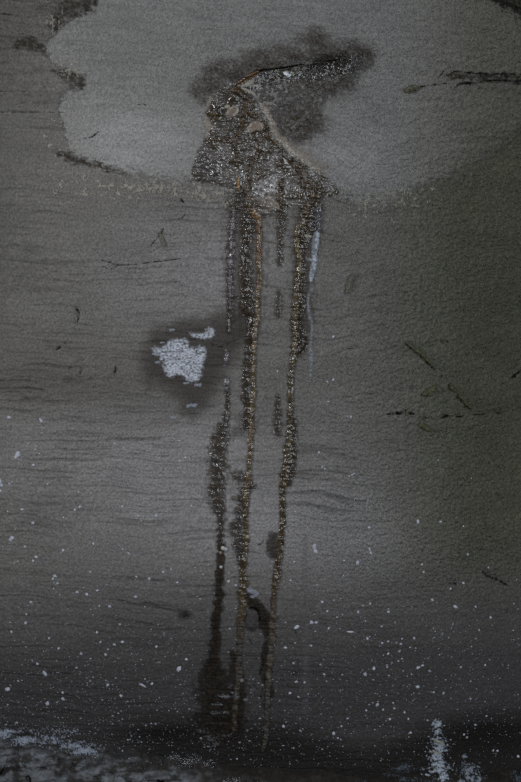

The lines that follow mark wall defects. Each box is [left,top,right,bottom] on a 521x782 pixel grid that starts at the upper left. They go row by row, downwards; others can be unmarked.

peeling [14,0,521,228]
crack [250,64,304,74]
efflorescence [152,327,214,387]
corrosion [194,190,319,752]